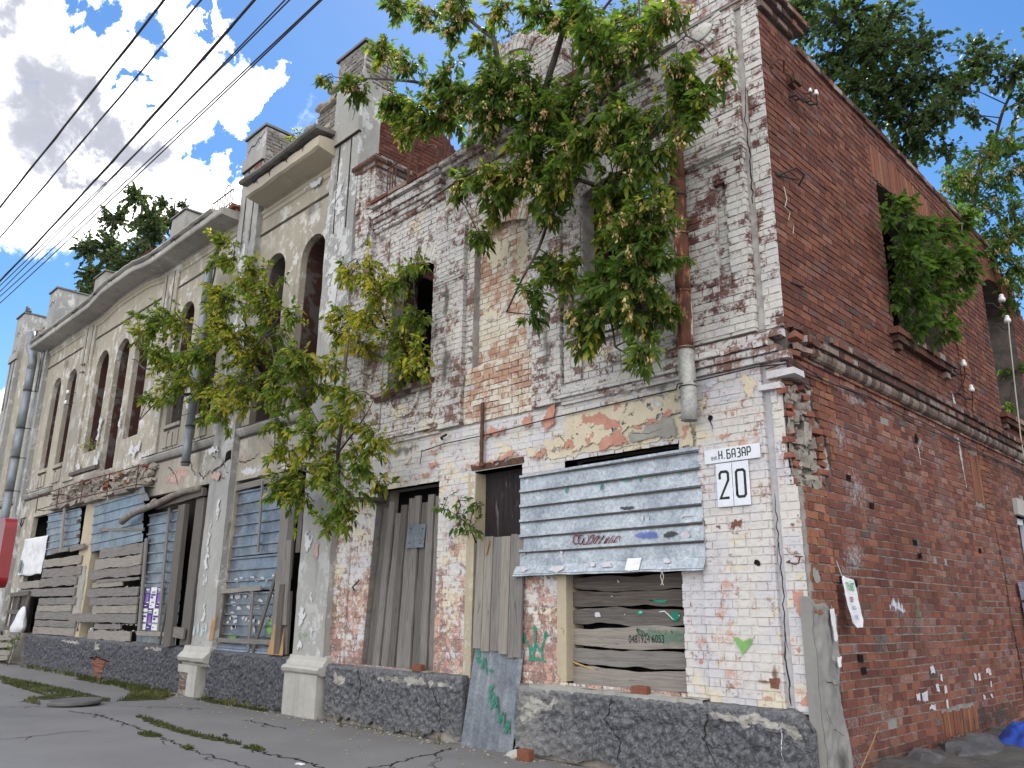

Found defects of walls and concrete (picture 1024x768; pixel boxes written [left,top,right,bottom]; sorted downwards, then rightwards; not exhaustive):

crack [744,87,754,204]
crack [168,450,256,485]
spalling [776,380,829,490]
peeling [202,493,221,587]
crack [774,493,791,704]